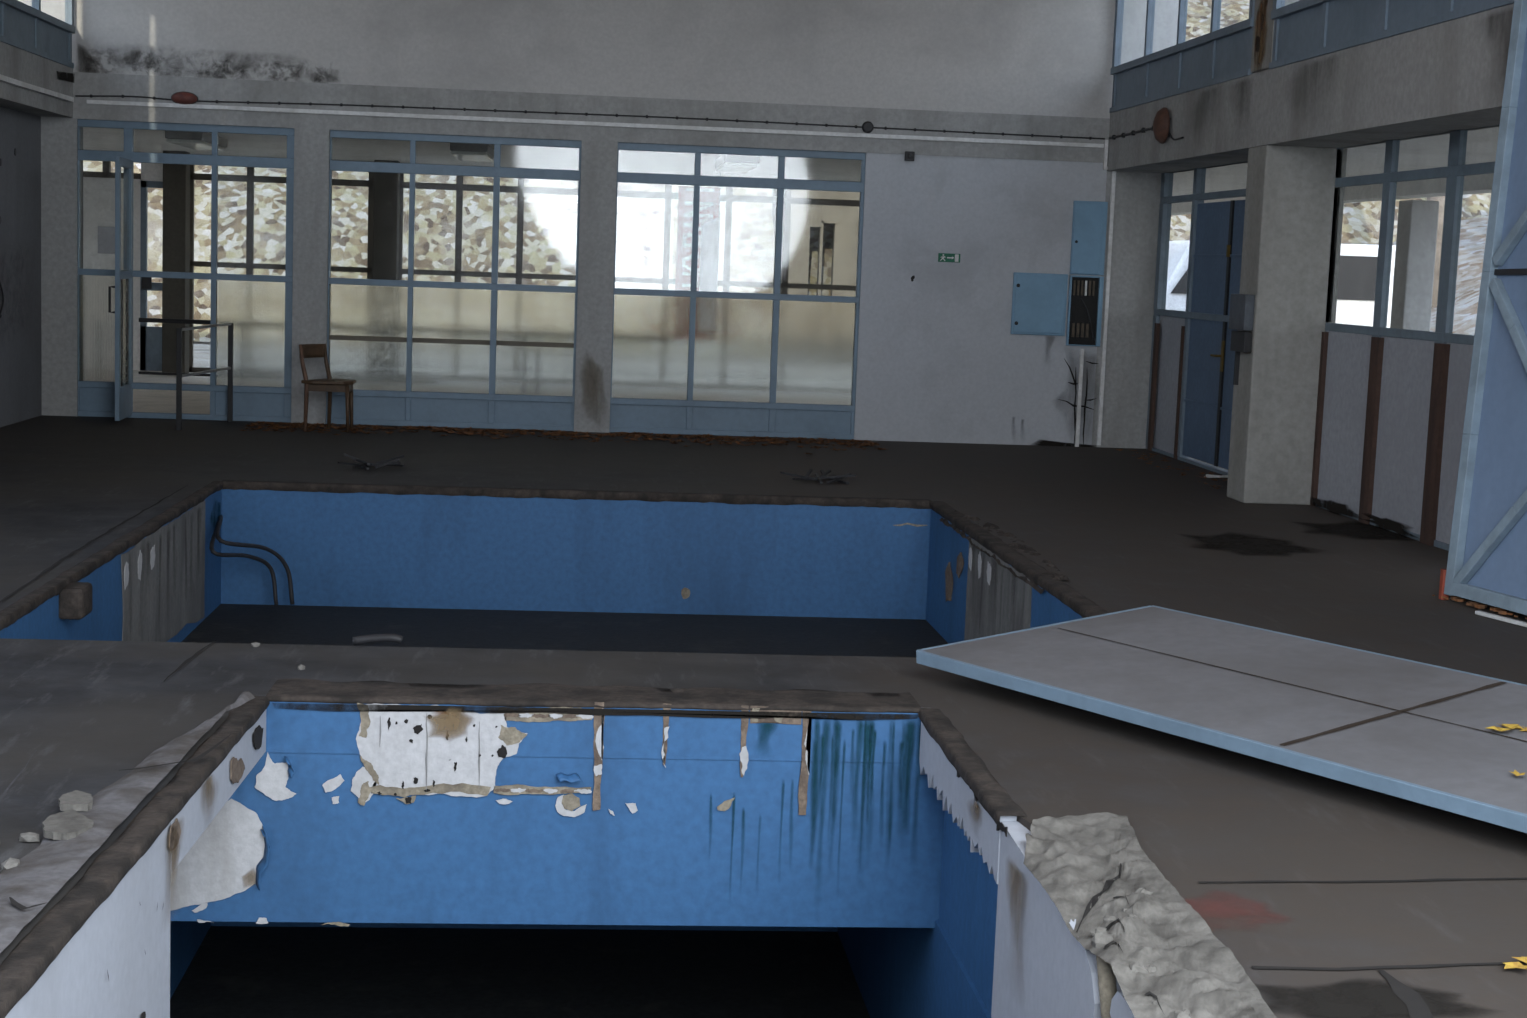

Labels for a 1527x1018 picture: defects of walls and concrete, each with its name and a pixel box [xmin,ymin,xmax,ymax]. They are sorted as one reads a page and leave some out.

damp [79,47,93,73]
damp [813,723,921,792]
spalling [0,678,1135,1018]